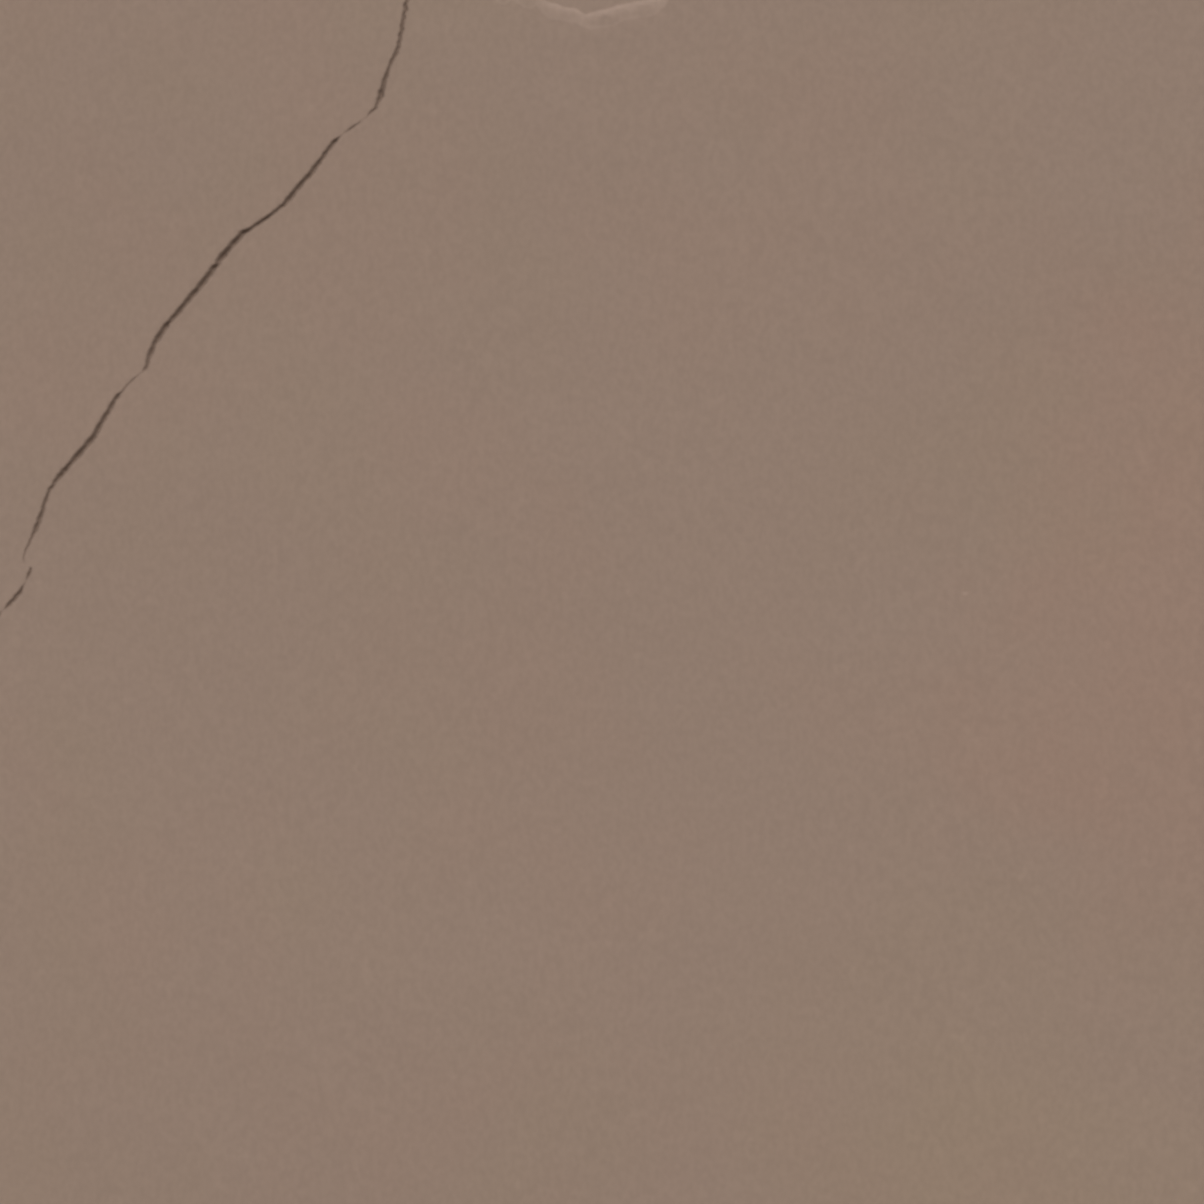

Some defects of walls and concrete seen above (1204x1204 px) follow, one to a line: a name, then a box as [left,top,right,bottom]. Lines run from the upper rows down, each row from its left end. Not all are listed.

crack [0,0,409,613]